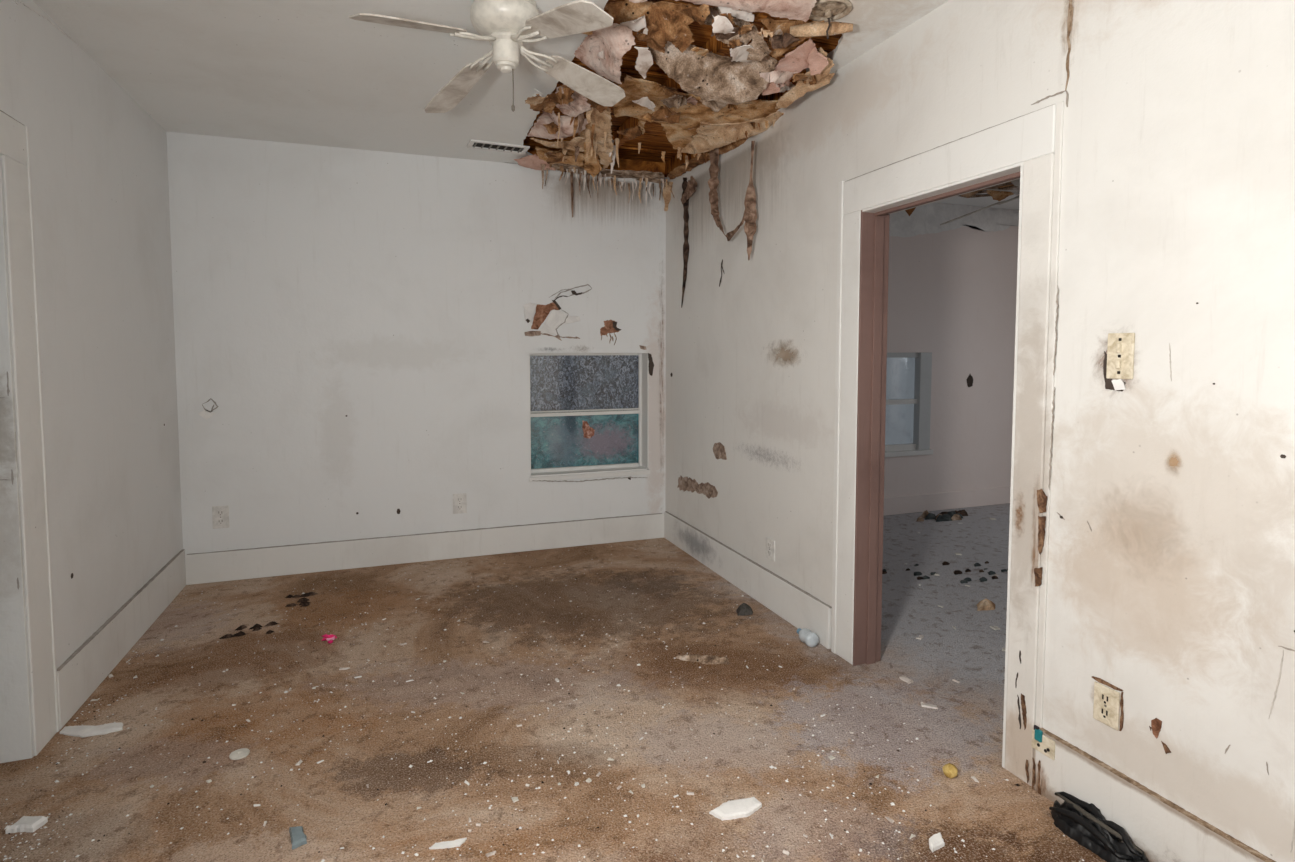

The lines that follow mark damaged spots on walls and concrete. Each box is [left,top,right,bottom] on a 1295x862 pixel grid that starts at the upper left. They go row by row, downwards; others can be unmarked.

crack [1031,0,1074,107]
spalling [523,300,580,341]
spalling [600,320,621,345]
damp [776,346,796,362]
spalling [713,442,727,460]
spalling [677,475,718,498]
spalling [1015,651,1027,729]
peeling [1149,718,1171,754]